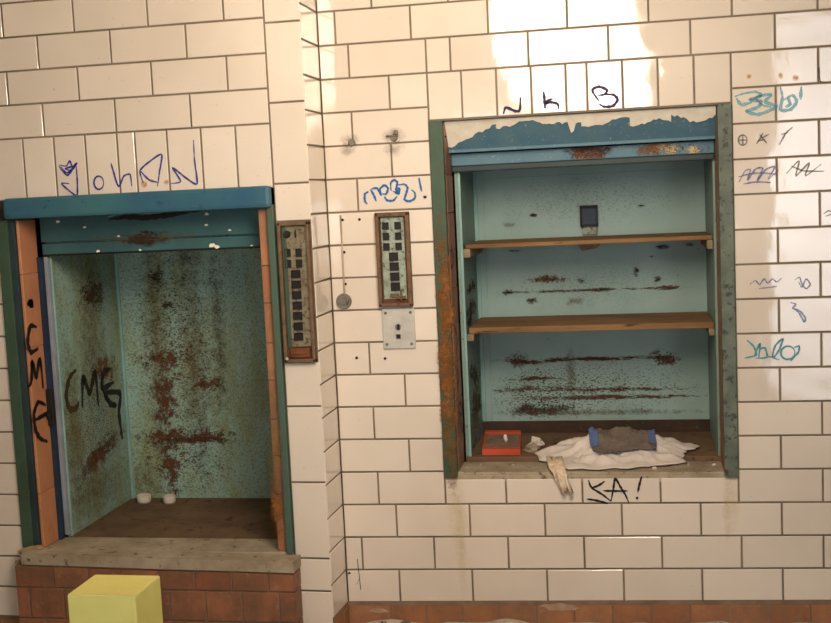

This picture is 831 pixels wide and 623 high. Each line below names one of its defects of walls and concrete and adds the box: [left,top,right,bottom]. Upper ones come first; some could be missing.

peeling [444,106,716,148]
corrosion [567,147,610,159]
corrosion [639,143,701,155]
corrosion [123,231,168,246]
corrosion [503,275,679,304]
corrosion [68,275,123,499]
corrosion [134,271,235,494]
corrosion [436,240,457,461]
corrosion [495,351,694,416]
corrosion [271,441,281,534]